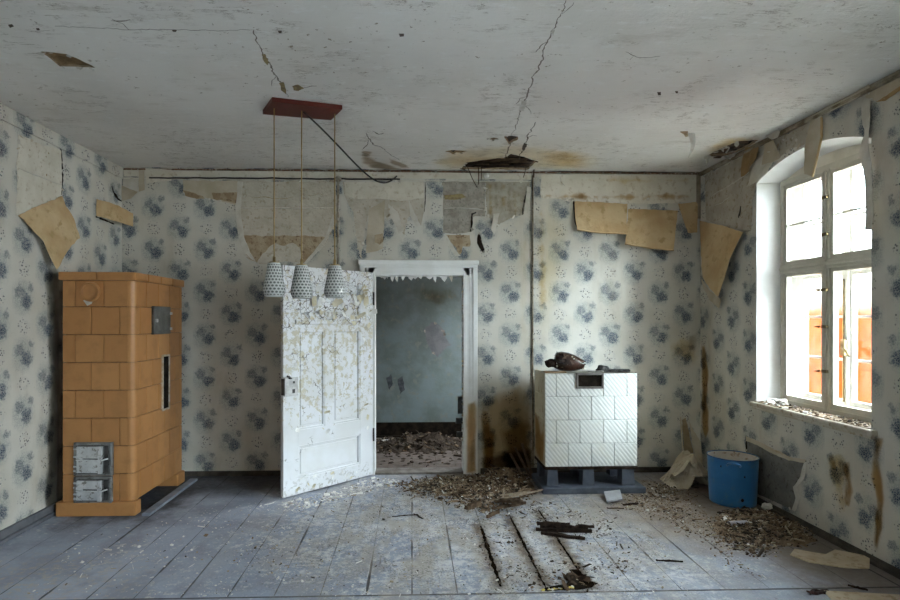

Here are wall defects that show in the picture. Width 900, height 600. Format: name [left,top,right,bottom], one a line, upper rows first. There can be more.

spalling [39,52,94,71]
crack [64,19,311,94]
crack [505,1,574,160]
crack [181,165,348,173]
crack [363,131,434,171]